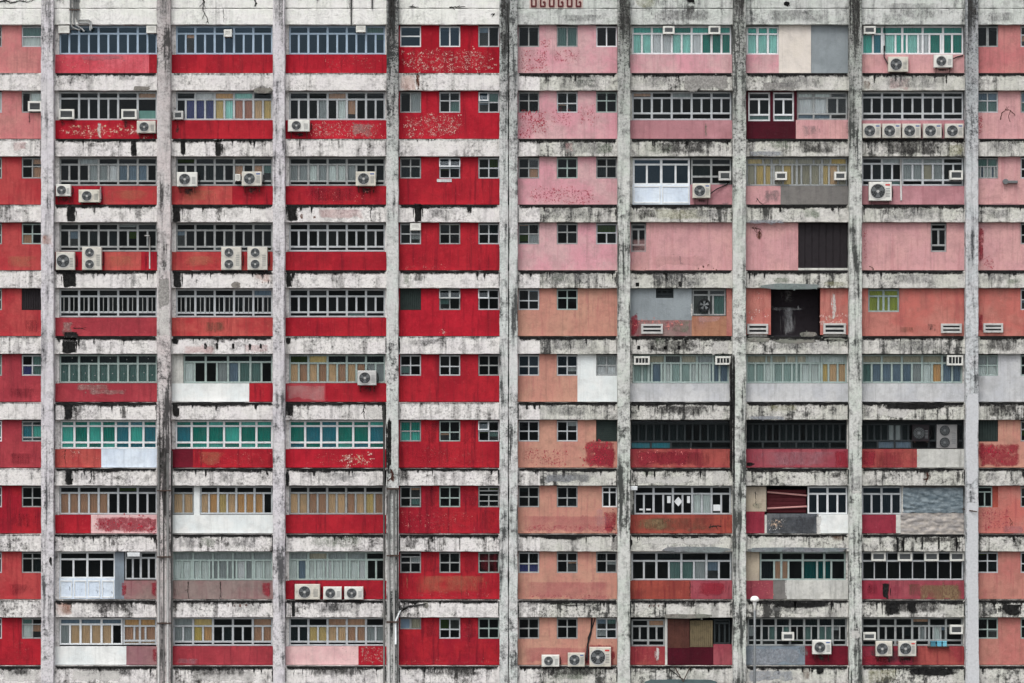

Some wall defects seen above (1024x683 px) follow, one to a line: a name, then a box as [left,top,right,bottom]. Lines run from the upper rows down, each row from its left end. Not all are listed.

peeling [404,46,497,73]
peeling [63,124,147,139]
peeling [403,113,461,138]
leakage [747,139,848,153]
leakage [55,198,156,222]
leakage [630,355,849,486]
peeling [981,443,1019,466]
peeling [95,513,156,534]
leakage [862,583,965,616]